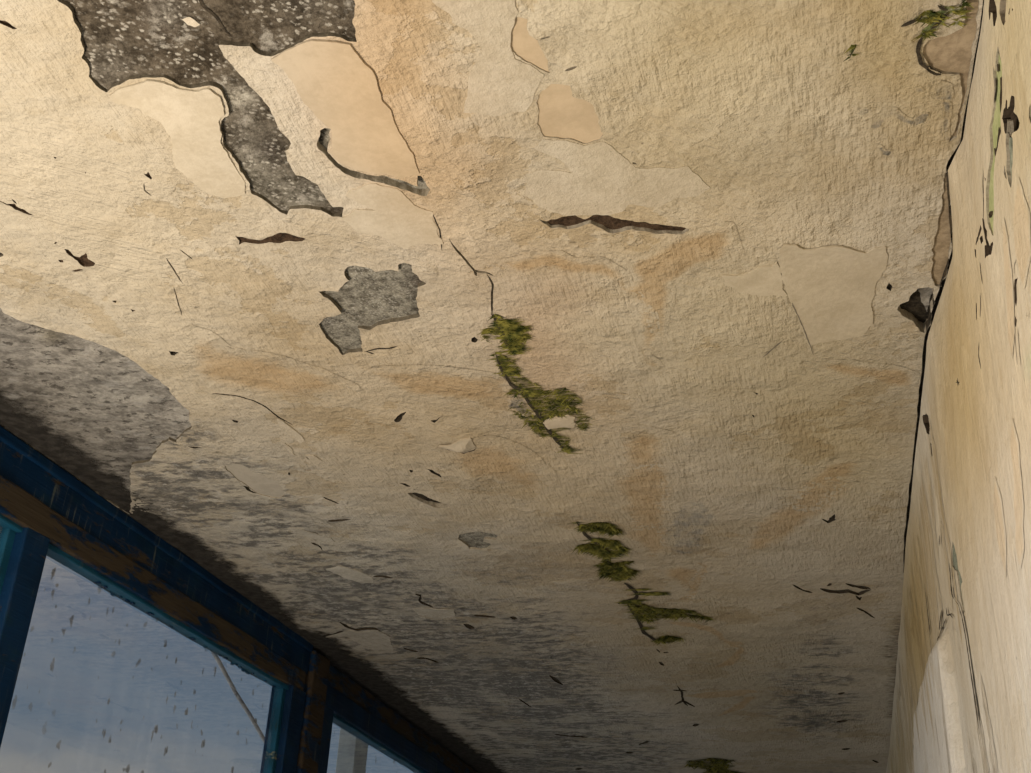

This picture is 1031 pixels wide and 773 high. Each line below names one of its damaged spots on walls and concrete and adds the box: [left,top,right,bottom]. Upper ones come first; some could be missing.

spalling [57,0,444,249]
flaking render [432,0,710,234]
spalling [994,54,1031,187]
spalling [54,242,95,272]
flaking render [0,308,192,492]
damp [175,325,514,410]
spalling [319,263,426,355]
crack [433,215,494,313]
flaking render [975,211,993,258]
damp [0,391,653,773]
crack [925,535,979,729]